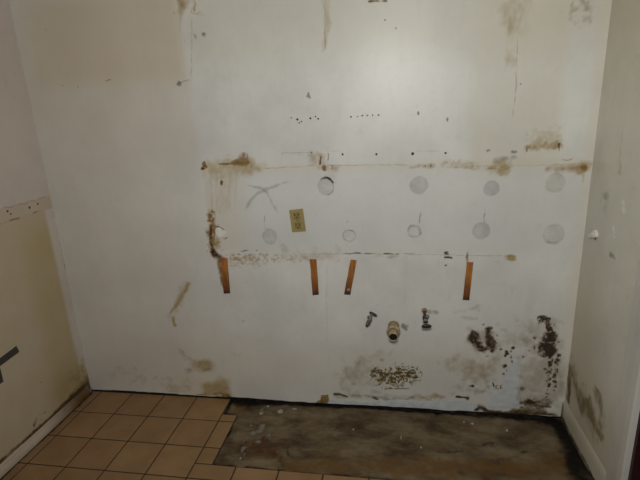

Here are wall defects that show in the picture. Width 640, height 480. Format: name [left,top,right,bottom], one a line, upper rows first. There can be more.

mould [370,365,421,389]
mould [467,324,515,375]
mould [533,315,561,391]